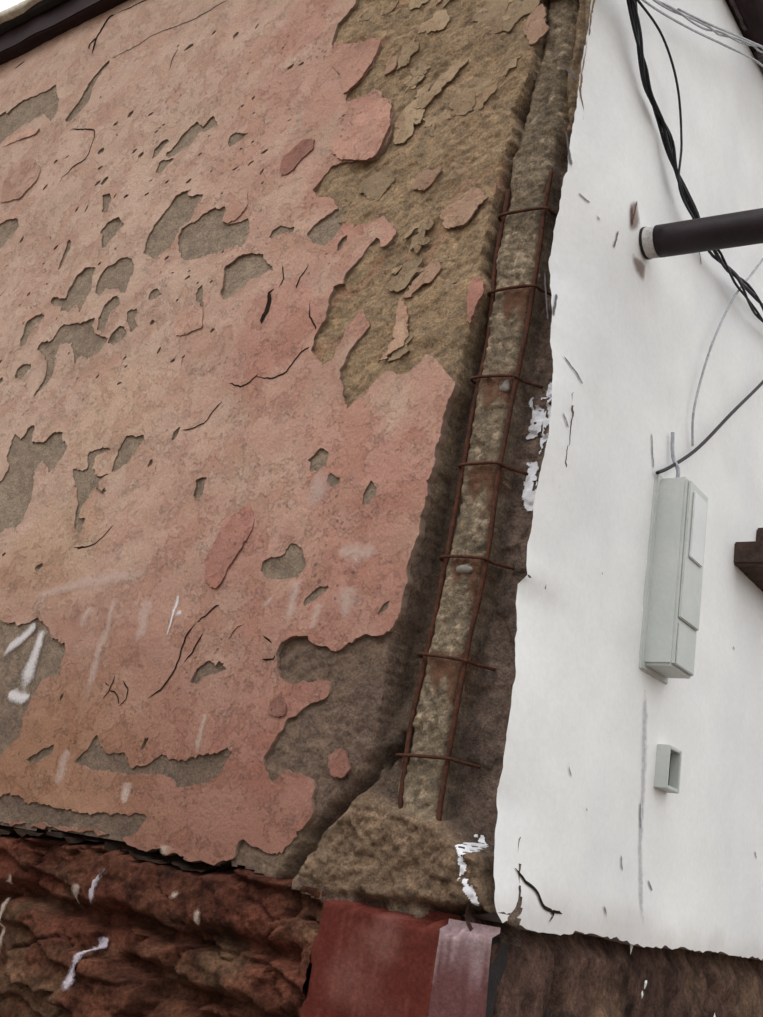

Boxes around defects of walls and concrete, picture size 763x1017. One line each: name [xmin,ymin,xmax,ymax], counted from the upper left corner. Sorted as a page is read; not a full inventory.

spalling [308,0,549,406]
peeling [37,258,138,393]
corrosion [482,377,514,406]
corrosion [453,558,483,604]
water stain [6,623,35,653]
crack [103,605,219,706]
water stain [8,690,29,703]
peeling [0,618,66,755]
spalling [231,630,395,895]
crack [0,825,239,872]
crack [515,868,562,922]
water stain [63,938,109,989]